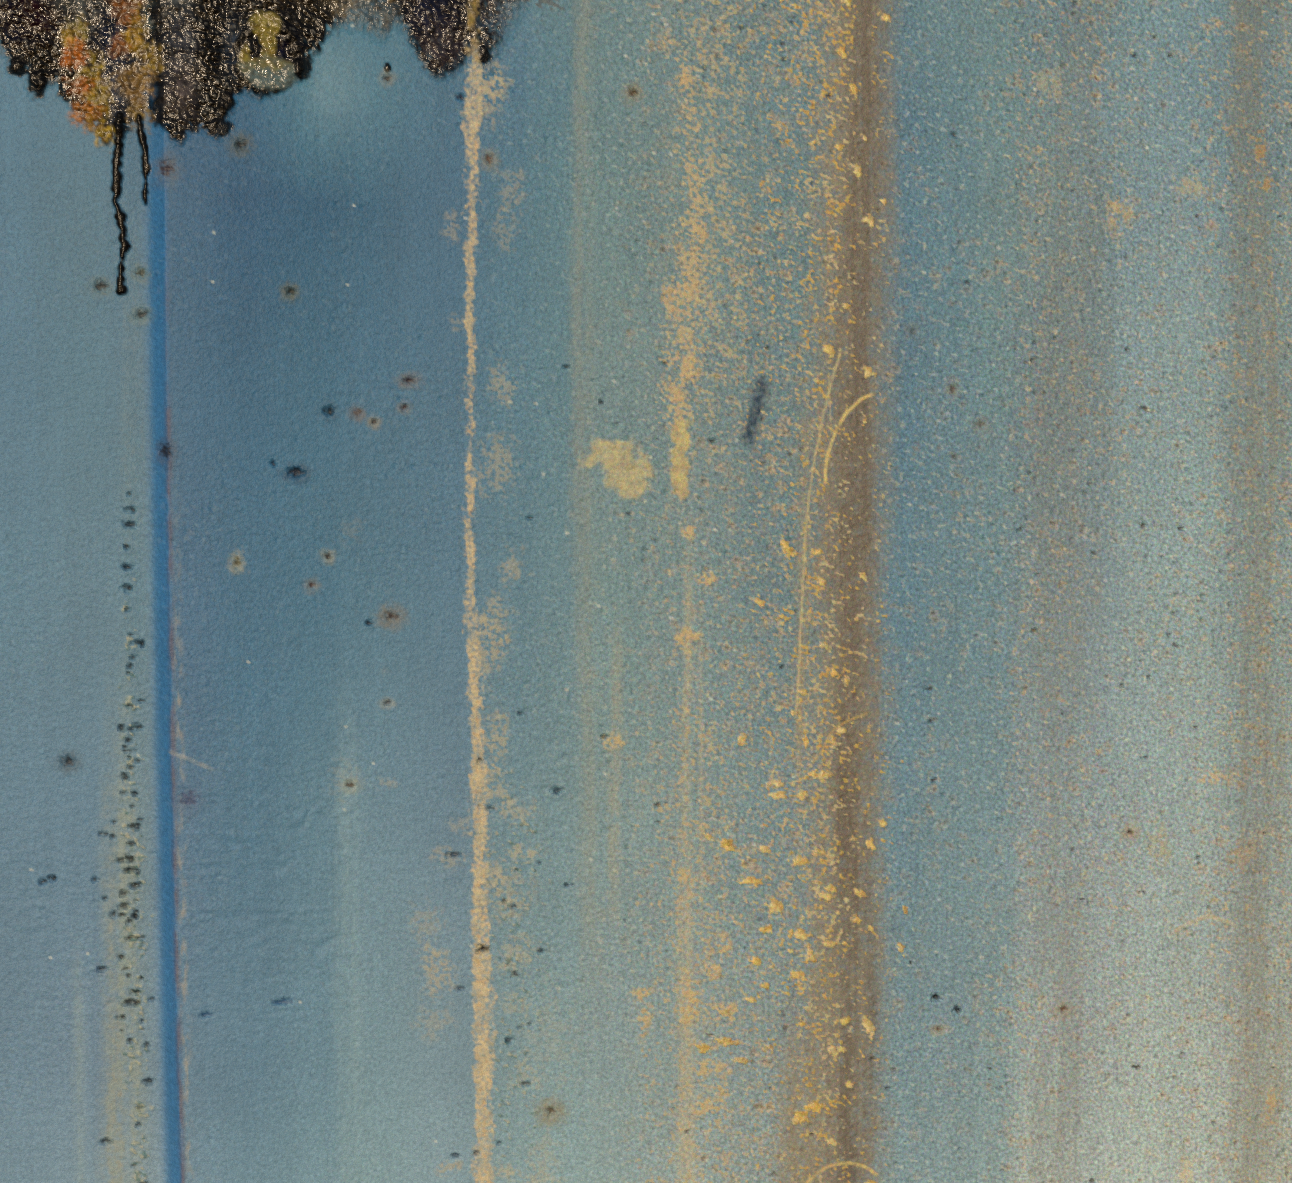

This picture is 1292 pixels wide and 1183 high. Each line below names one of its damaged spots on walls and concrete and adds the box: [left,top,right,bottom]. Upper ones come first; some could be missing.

rust [0,0,566,298]